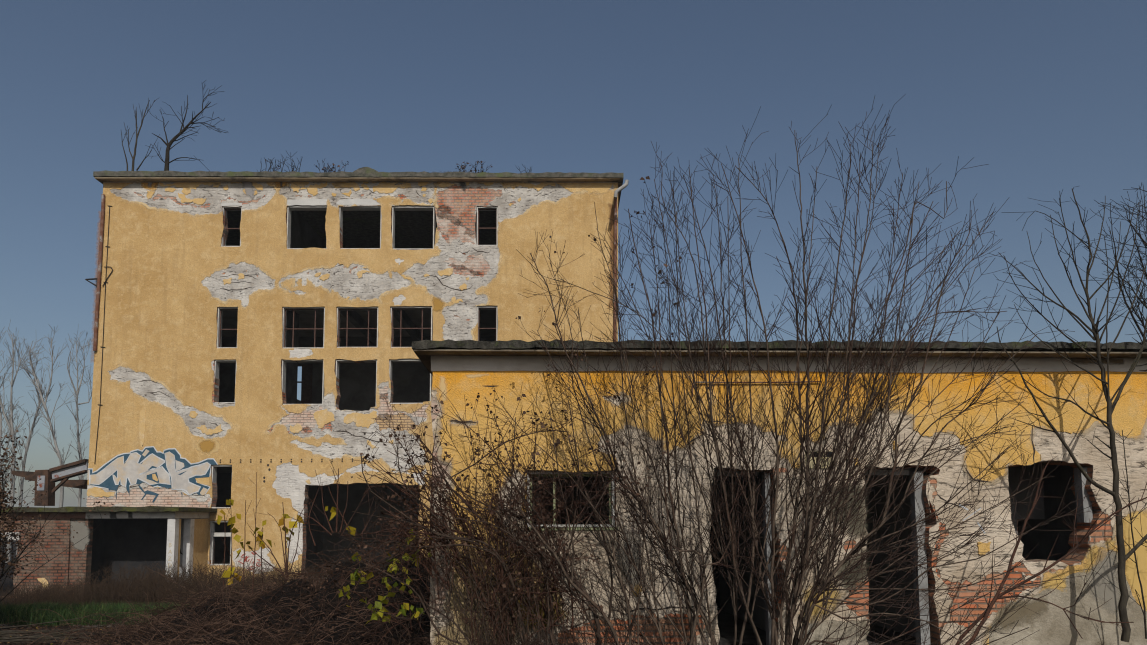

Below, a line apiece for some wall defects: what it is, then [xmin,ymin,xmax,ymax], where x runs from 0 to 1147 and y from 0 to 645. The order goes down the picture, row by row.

flaking render [110,182,615,341]
flaking render [108,359,235,439]
flaking render [232,381,476,645]
flaking render [495,409,1147,645]